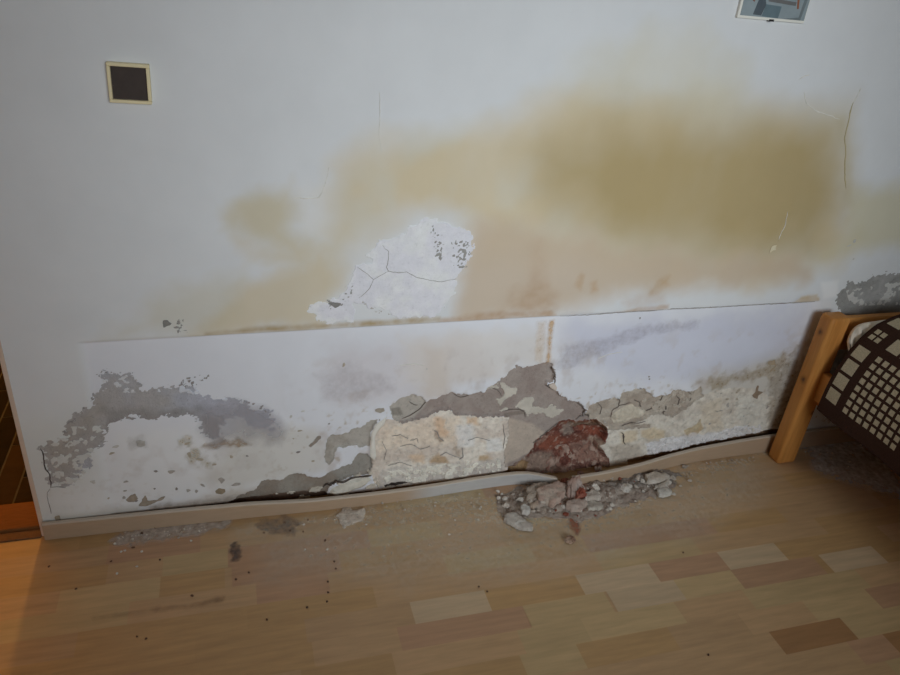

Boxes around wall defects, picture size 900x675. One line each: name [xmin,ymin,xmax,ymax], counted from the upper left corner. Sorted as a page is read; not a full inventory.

damp [89,5,900,342]
crack [844,88,861,187]
peeling [307,217,475,324]
crack [359,246,455,298]
peeling [835,271,900,315]
crack [40,449,66,512]
peeling [122,481,165,506]
peeling [37,370,280,487]
spalling [215,362,704,513]